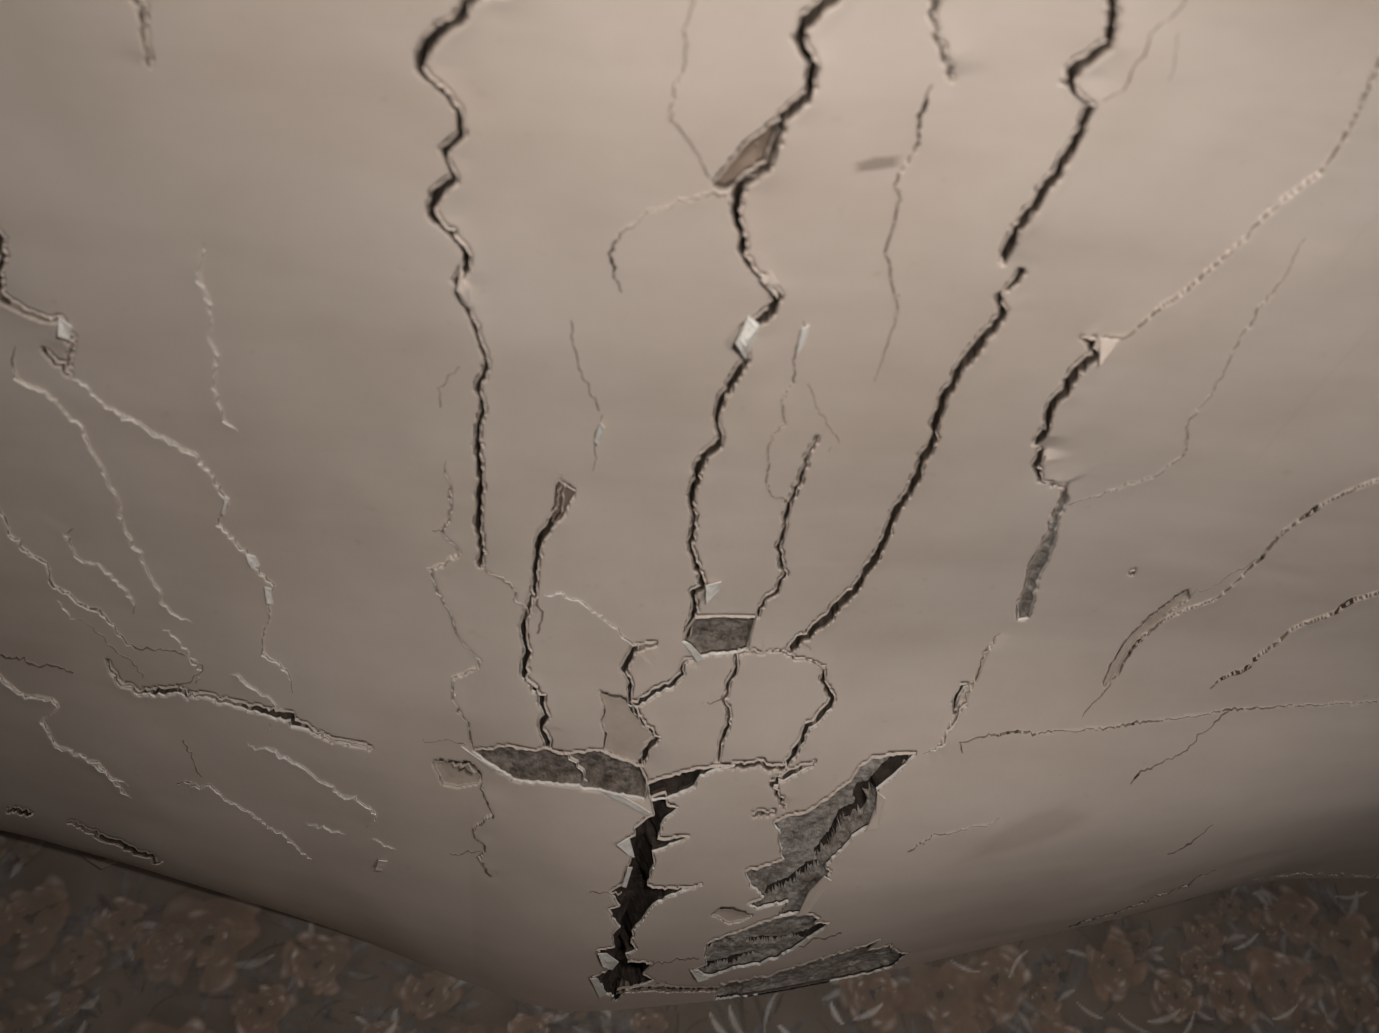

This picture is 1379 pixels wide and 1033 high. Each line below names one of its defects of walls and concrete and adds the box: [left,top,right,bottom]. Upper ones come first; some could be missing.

peeling [712,114,780,189]
crack [1031,57,1379,505]
crack [415,0,1186,817]
crack [0,230,397,871]
flaking render [1017,484,1068,621]
flaking render [682,615,756,662]
crack [923,479,1379,784]
crack [450,783,495,877]
flaking render [461,693,916,1002]
crack [1069,824,1216,927]
crack [616,978,720,995]